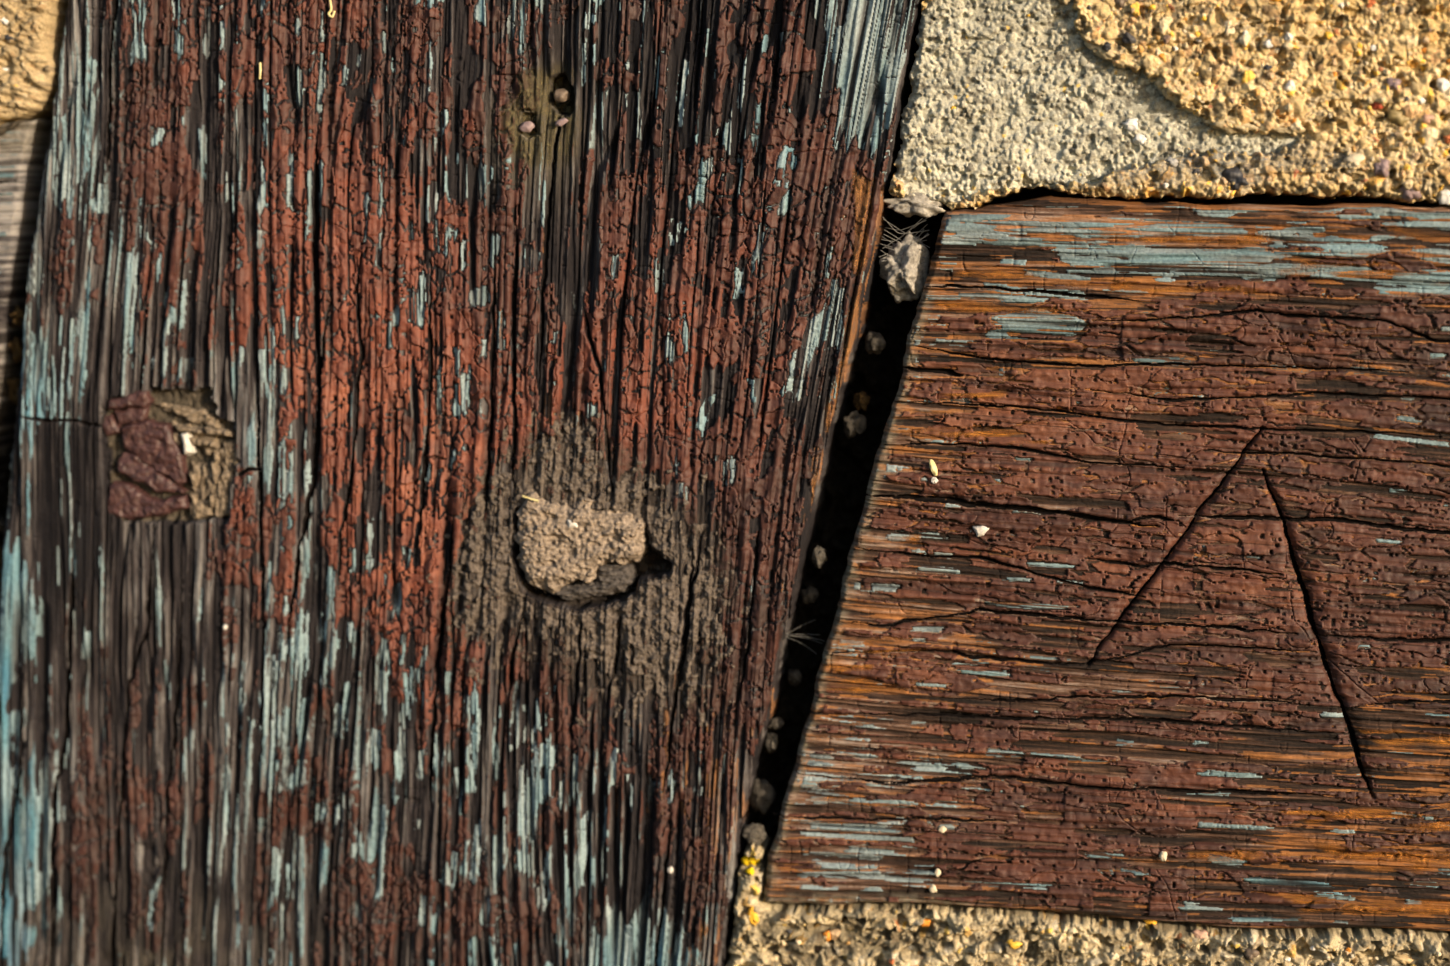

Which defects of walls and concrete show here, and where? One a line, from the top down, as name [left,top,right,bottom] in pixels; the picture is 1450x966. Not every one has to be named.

spalling [0,120,28,136]
peeling [26,196,106,332]
peeling [39,641,243,966]
peeling [102,0,580,786]
peeling [239,635,635,966]
peeling [567,0,1306,966]
crack [806,547,1450,733]
crack [864,493,1450,535]